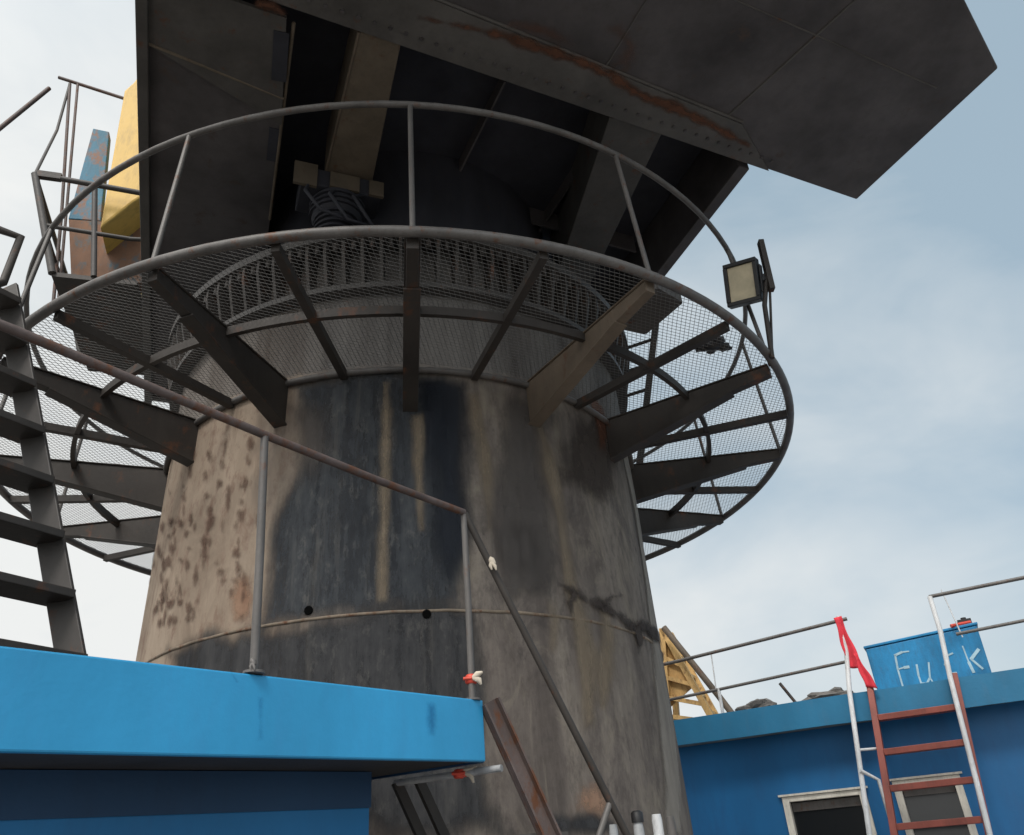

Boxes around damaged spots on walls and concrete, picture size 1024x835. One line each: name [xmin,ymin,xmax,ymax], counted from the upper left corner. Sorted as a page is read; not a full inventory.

rust [454,24,749,145]
water stain [175,373,485,705]
water stain [369,763,499,835]